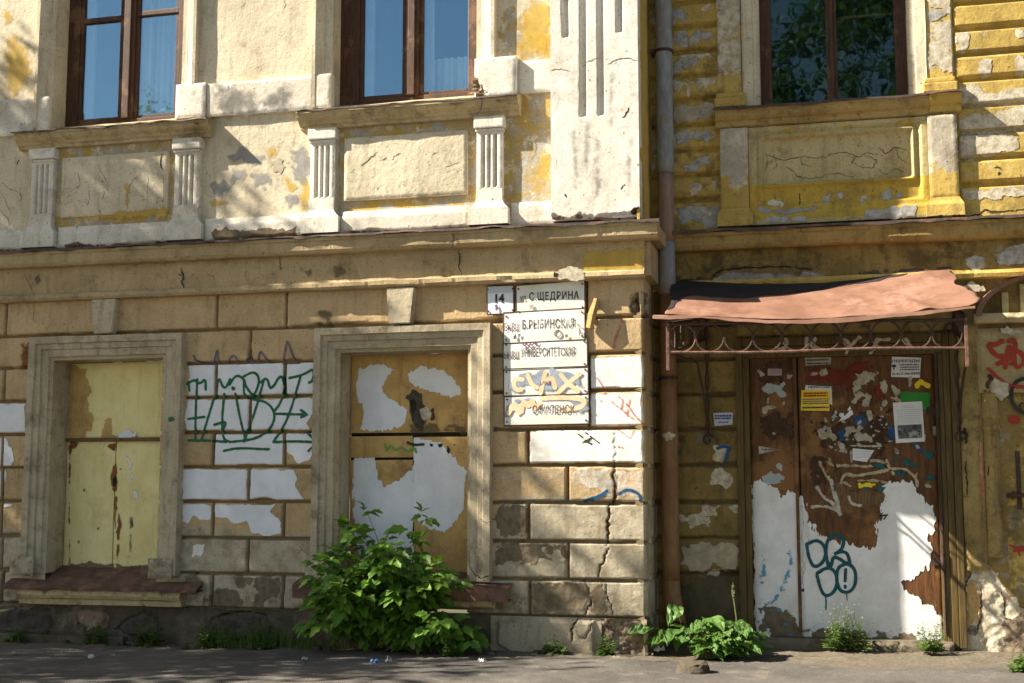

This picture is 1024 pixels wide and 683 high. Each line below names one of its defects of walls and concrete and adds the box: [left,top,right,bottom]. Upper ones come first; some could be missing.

peeling [520,2,550,57]
peeling [672,0,741,144]
peeling [957,55,1024,159]
peeling [211,146,311,210]
crack [765,147,907,207]
peeling [860,188,917,220]
peeling [962,185,1024,201]
peeling [405,389,435,429]
rust [110,464,133,559]
crack [570,453,618,639]
peeling [680,542,739,577]
spalling [962,559,1024,652]